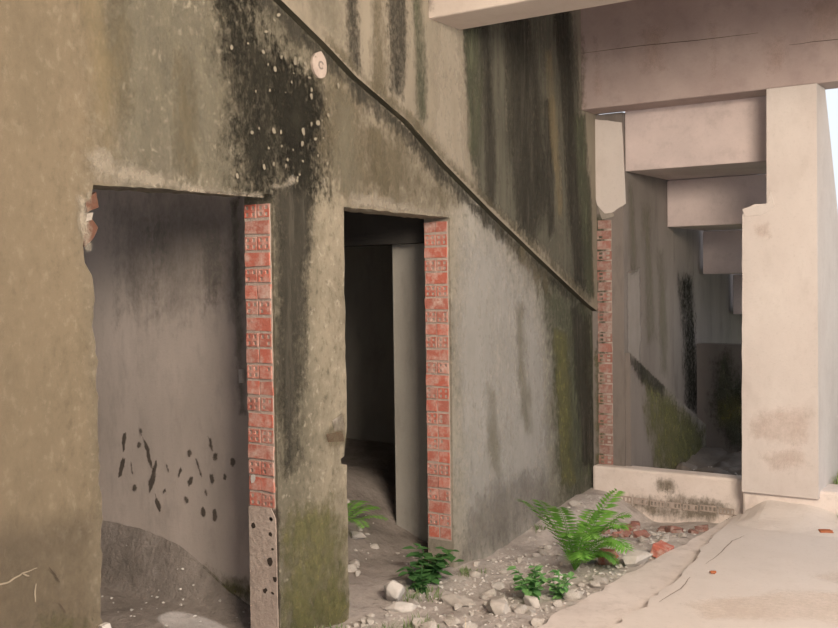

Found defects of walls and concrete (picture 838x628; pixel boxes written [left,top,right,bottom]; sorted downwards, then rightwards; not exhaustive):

water stain [347,0,361,70]
water stain [372,0,426,120]
water stain [210,0,339,472]
water stain [462,11,606,512]
flaking render [118,432,133,477]
flaking render [137,428,169,512]